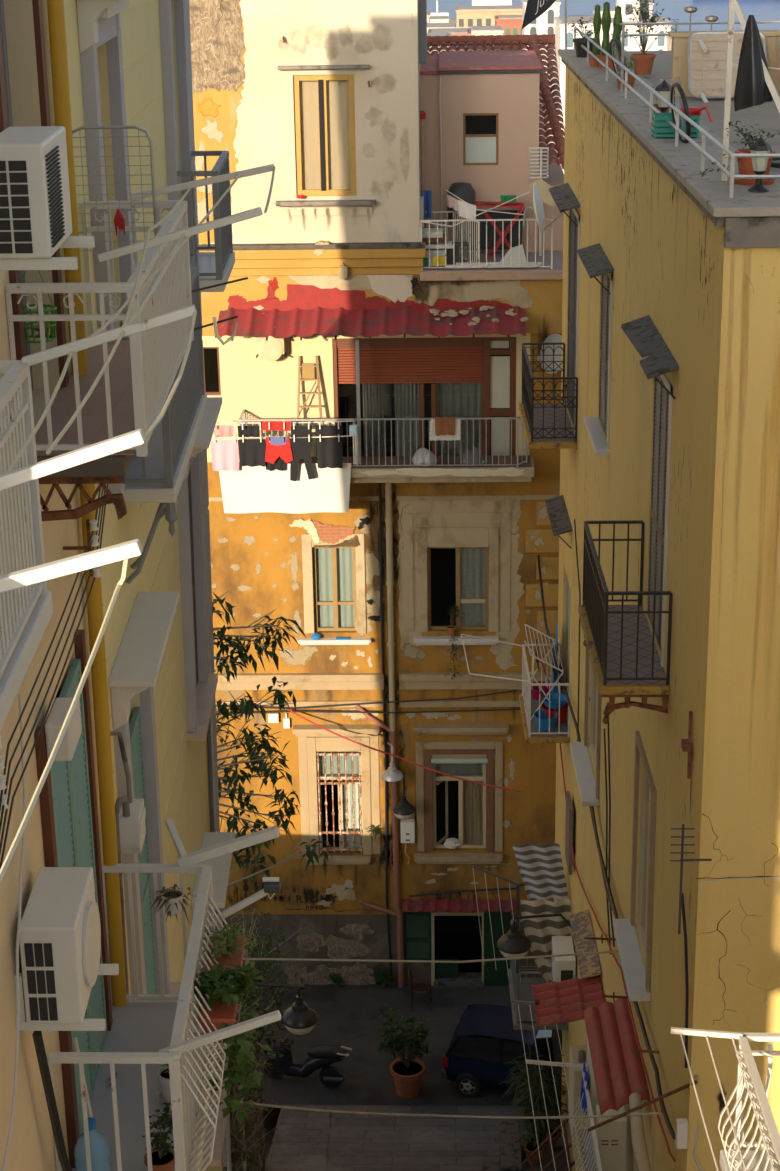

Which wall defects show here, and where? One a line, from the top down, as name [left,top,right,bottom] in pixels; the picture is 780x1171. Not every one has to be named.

spalling [314,240,330,256]
peeling [227,262,533,314]
flaking render [289,515,381,669]
flaking render [397,500,549,671]
flaking render [280,610,317,665]
crack [696,813,779,1026]
spalling [284,923,376,985]